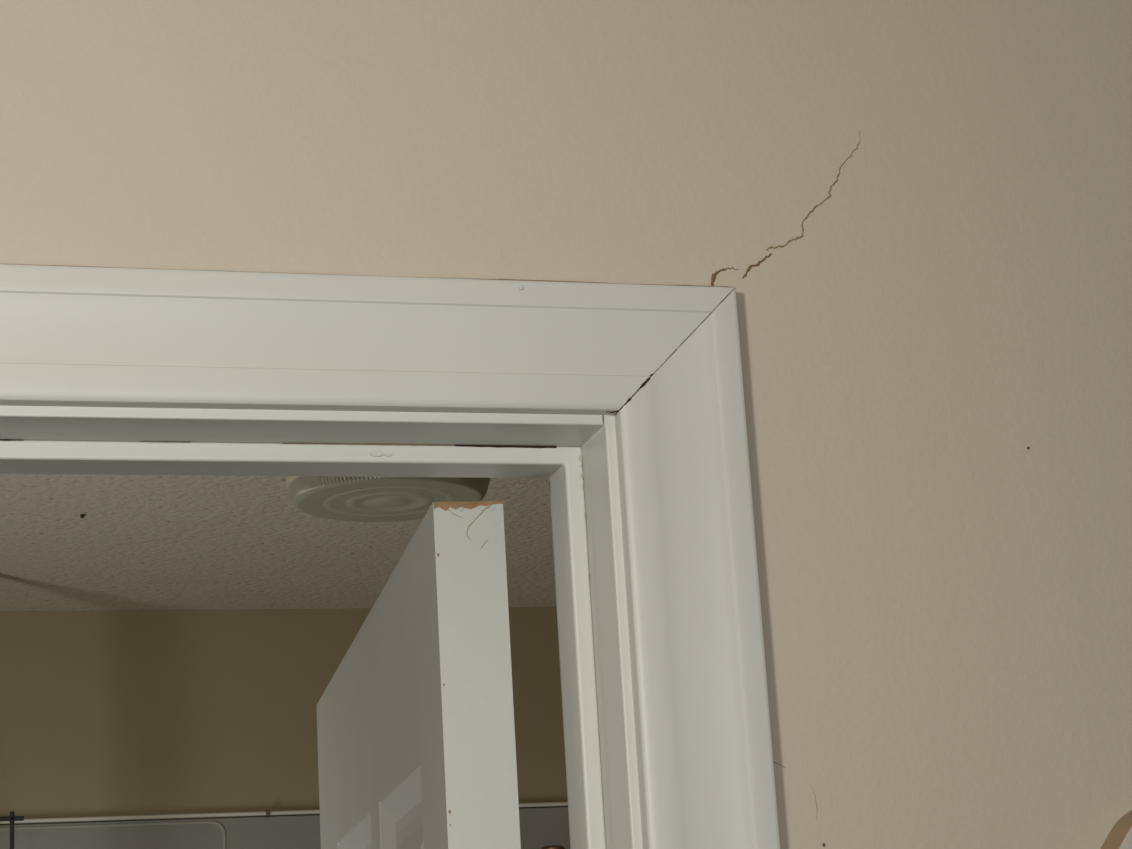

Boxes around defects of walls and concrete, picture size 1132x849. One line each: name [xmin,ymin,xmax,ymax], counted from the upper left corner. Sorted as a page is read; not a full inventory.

crack [426,133,860,424]